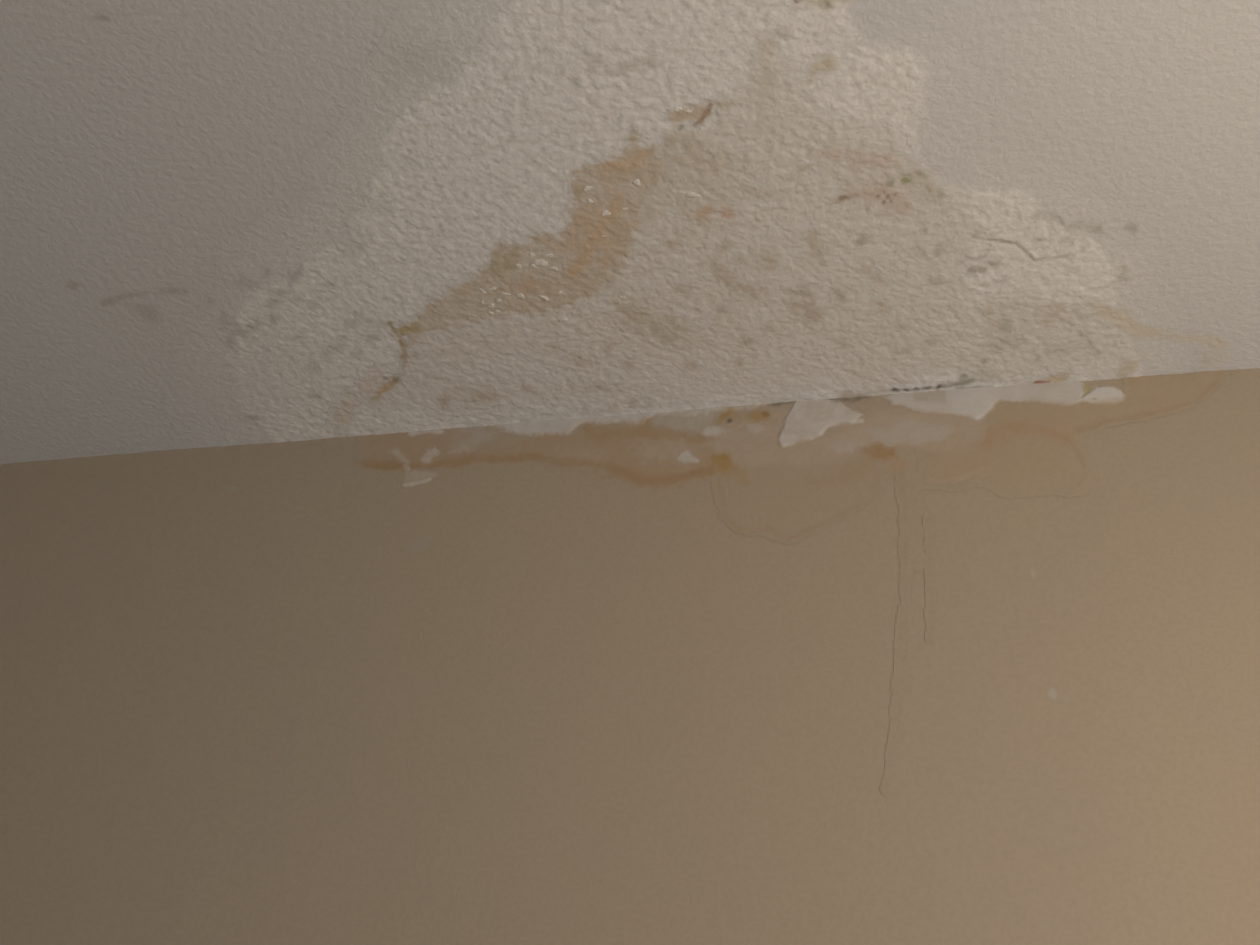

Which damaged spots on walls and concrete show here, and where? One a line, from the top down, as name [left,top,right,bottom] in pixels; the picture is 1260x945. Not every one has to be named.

flaking render [161,0,1194,449]
leakage [352,31,1240,500]